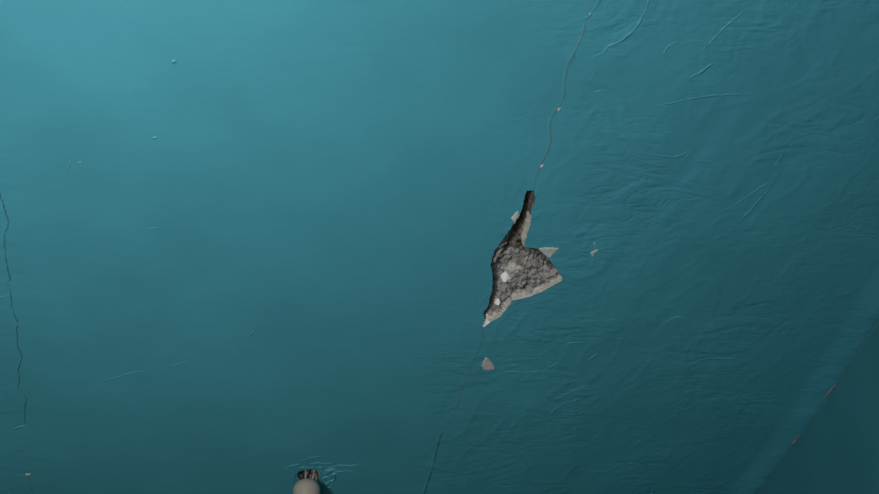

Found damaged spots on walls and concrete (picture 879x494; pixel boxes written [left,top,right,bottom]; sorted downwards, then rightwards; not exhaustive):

crack [0,194,27,426]
peeling [481,357,494,370]
flaking render [483,191,562,327]